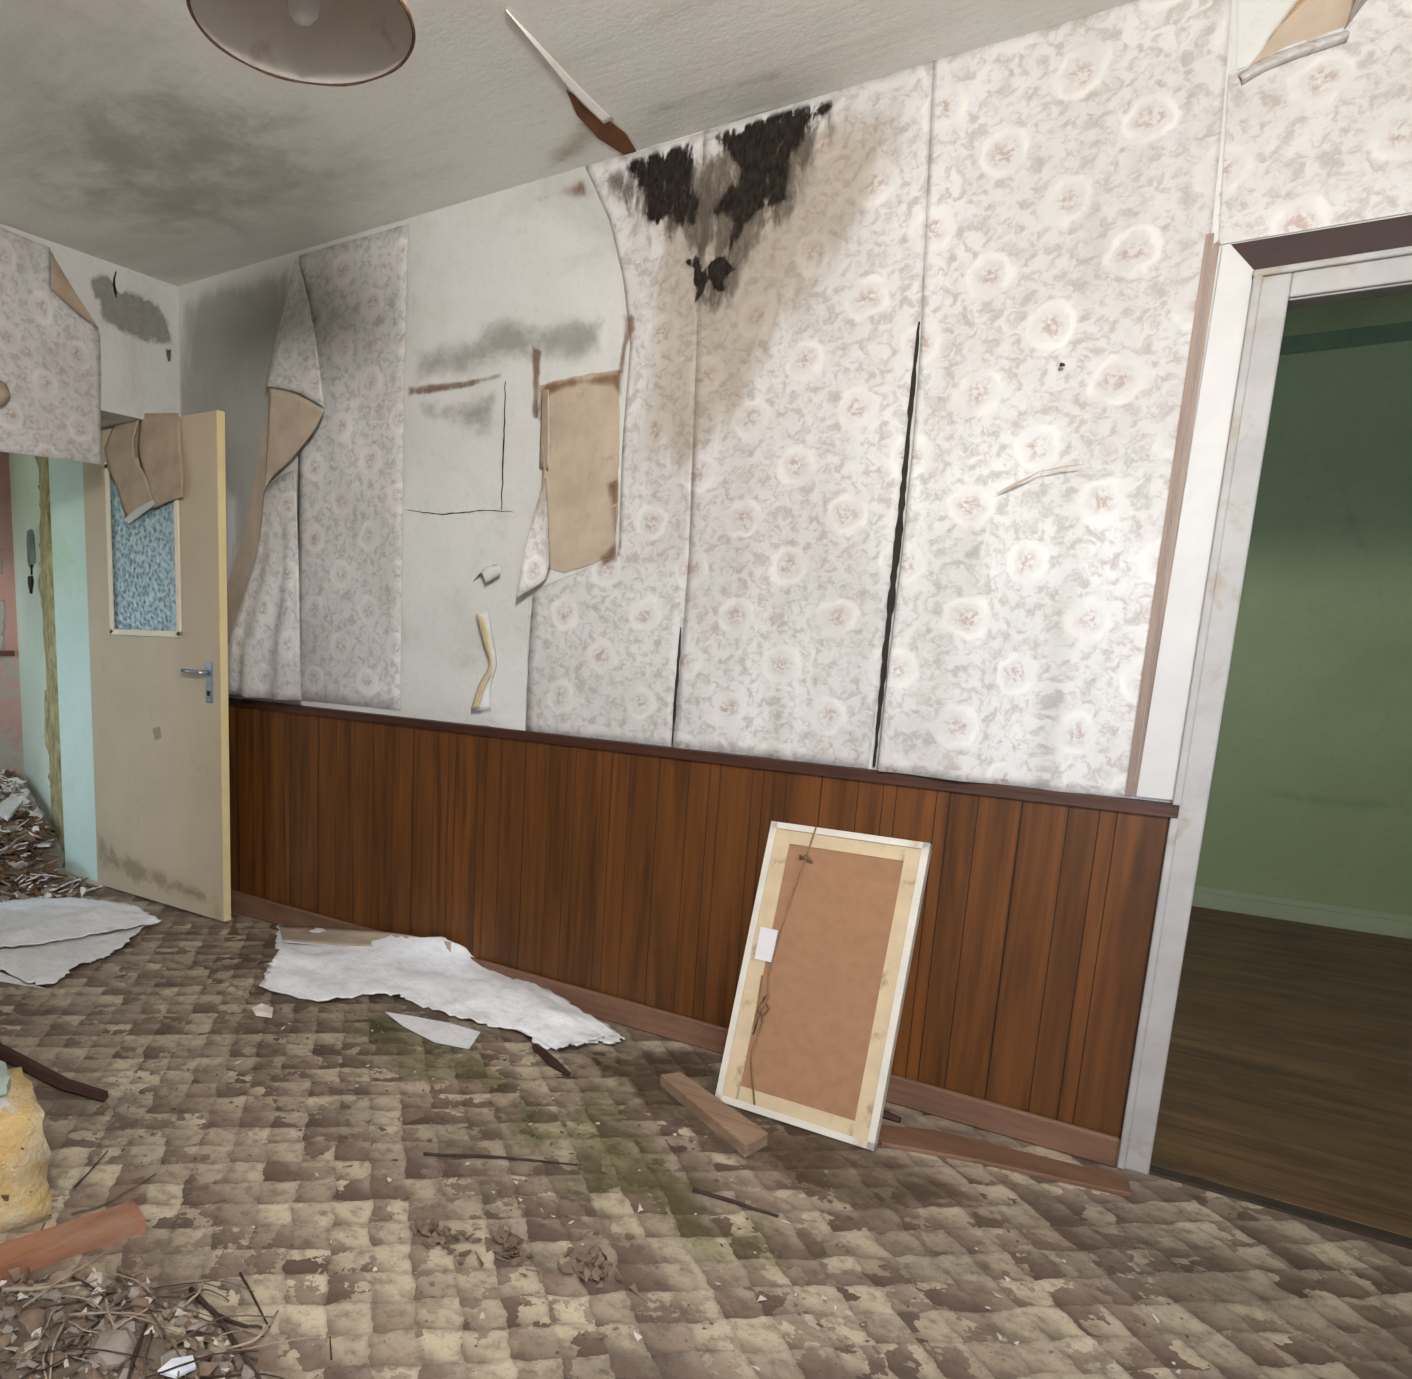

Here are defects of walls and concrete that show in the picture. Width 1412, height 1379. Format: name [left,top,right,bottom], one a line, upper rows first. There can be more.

water stain [610,101,832,308]
spalling [92,276,171,361]
peeling [471,592,530,730]